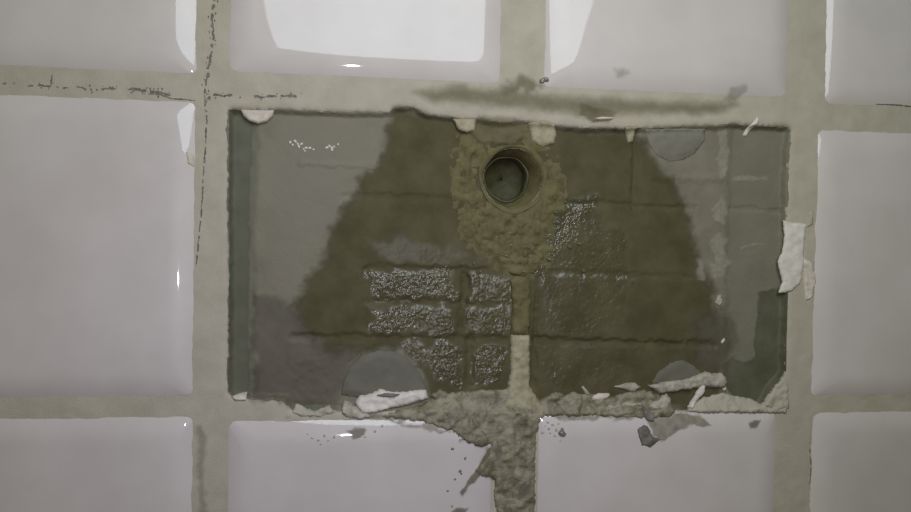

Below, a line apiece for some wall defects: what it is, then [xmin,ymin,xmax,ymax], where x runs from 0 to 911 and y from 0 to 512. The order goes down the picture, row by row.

crack [2,0,302,266]
peeling [241,110,274,124]
peeling [453,118,476,133]
peeling [528,120,556,148]
peeling [625,126,637,143]
peeling [743,116,759,137]
water stain [228,81,788,409]
peeling [777,211,816,301]
peeling [355,389,428,413]